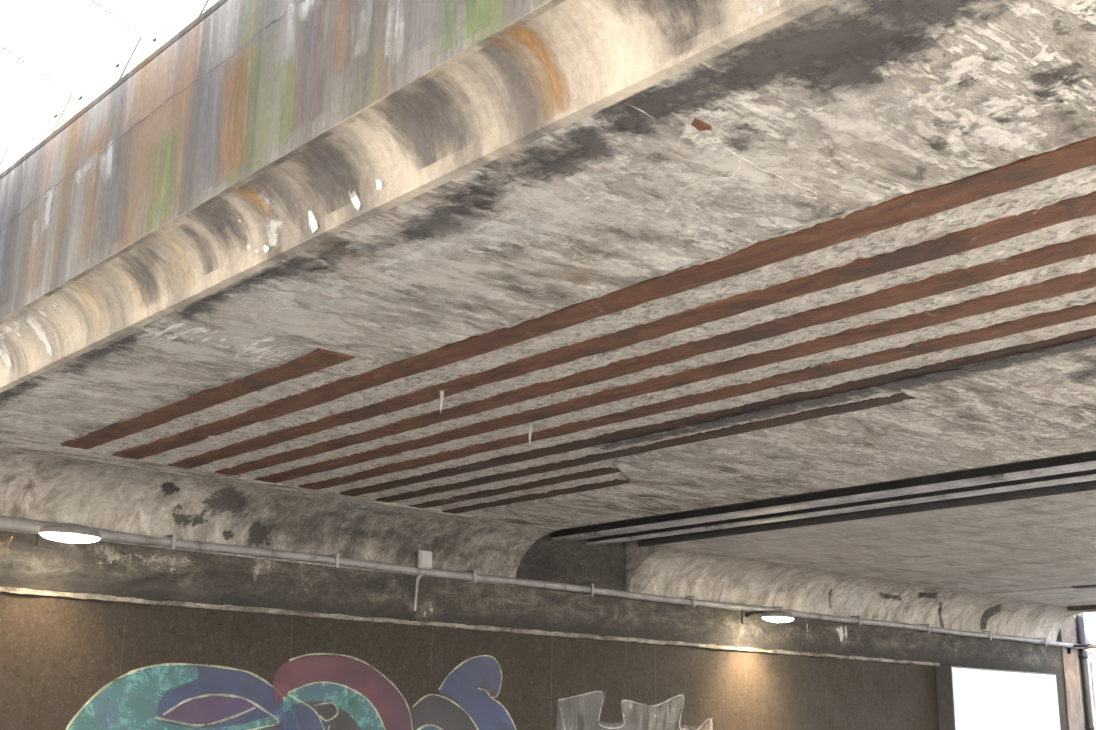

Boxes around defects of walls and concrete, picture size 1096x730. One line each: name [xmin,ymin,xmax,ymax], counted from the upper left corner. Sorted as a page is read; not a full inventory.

corrosion [502,27,564,109]
damp [0,0,1002,436]
peeling [655,46,1096,277]
spalling [58,164,1096,527]
damp [598,336,1096,449]
peeling [95,545,191,571]
spalling [248,523,270,546]